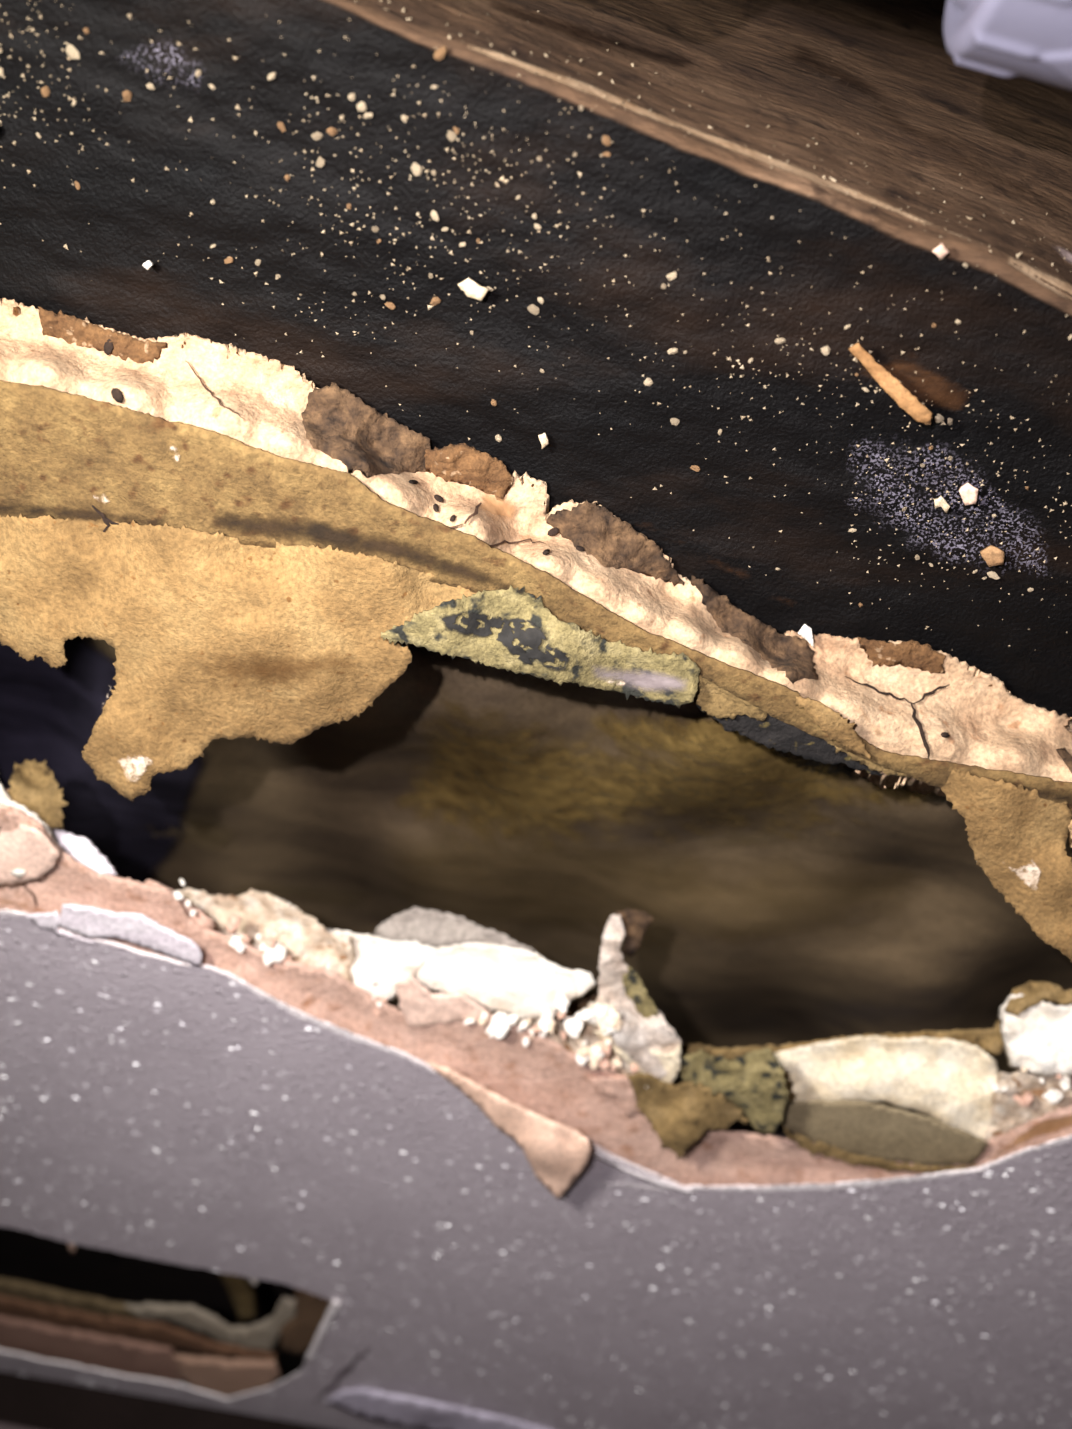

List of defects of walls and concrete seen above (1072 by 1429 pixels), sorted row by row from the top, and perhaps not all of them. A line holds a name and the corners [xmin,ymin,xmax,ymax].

spalling [457,277,489,300]
water stain [0,0,1072,717]
spalling [0,298,1072,819]
spalling [932,243,949,259]
spalling [0,779,1072,1200]
spalling [0,1277,342,1398]